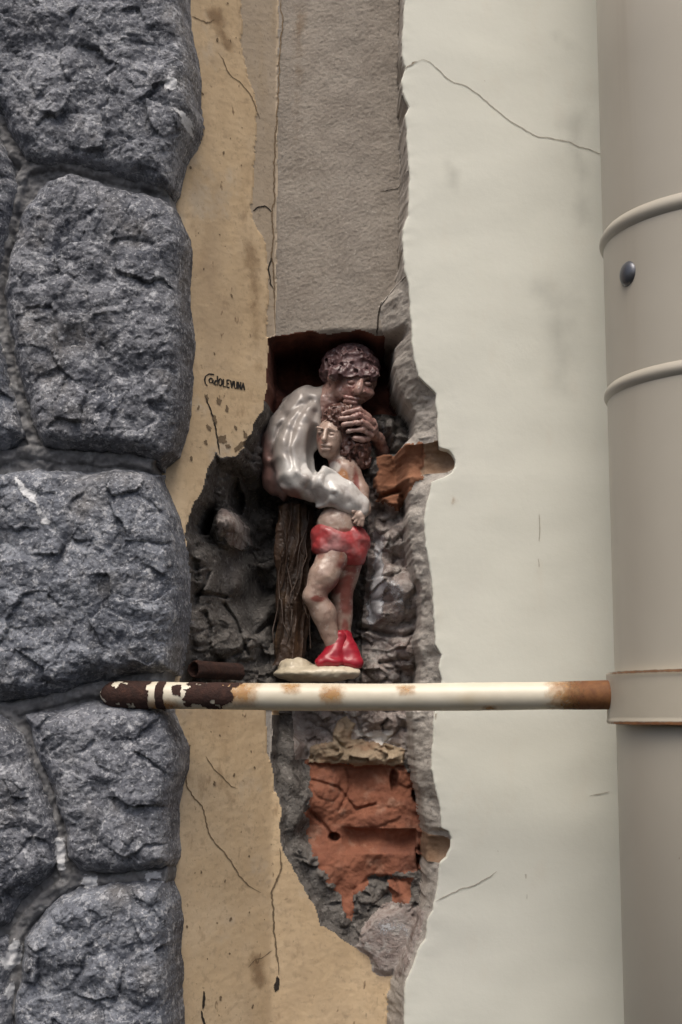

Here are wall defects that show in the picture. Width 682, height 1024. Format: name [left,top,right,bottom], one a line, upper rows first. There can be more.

crack [219,2,284,319]
crack [405,59,600,154]
spalling [180,0,455,684]
rust [100,681,252,709]
rust [555,669,682,710]
crack [185,776,282,992]
spalling [266,710,451,1024]
crack [435,871,497,902]